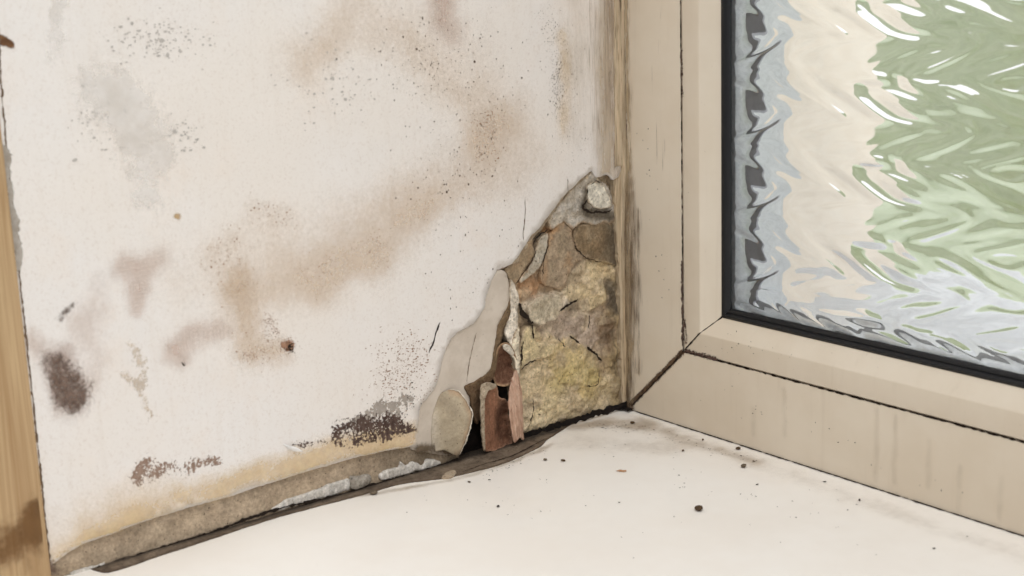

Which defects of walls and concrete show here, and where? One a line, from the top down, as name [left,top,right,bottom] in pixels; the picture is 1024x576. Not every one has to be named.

leakage [103,17,233,70]
leakage [393,16,504,101]
leakage [228,312,298,373]
leakage [44,355,87,413]
leakage [205,322,437,498]
spalling [51,172,627,576]
leakage [129,455,223,487]
leakage [72,506,159,547]